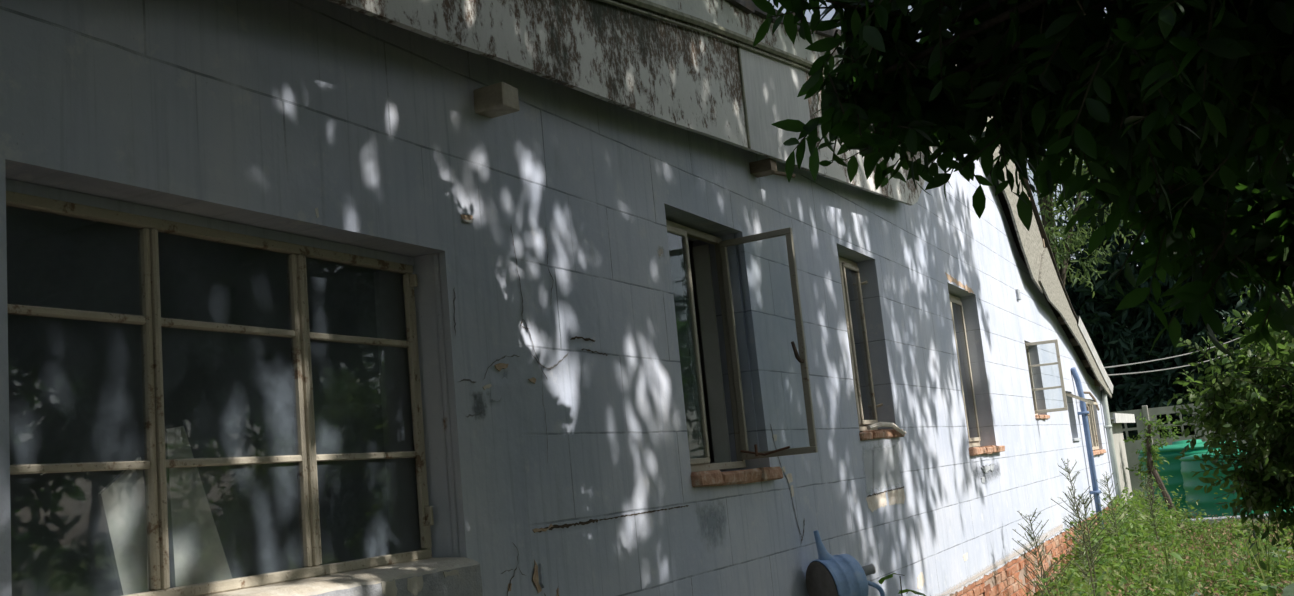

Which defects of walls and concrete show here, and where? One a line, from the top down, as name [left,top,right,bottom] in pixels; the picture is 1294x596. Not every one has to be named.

crack [511,227,607,463]
peeling [381,576,423,596]
crack [501,505,689,596]